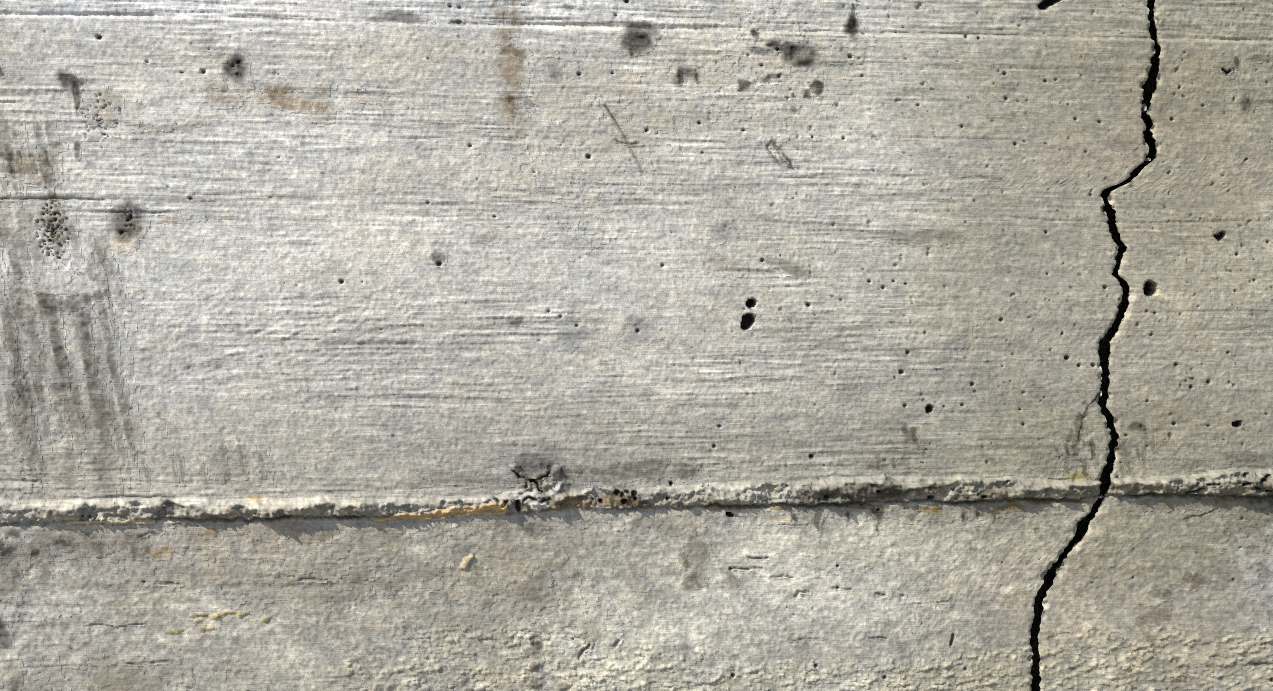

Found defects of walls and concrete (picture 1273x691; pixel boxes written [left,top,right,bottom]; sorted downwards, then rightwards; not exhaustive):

damp [0,108,661,653]
damp [565,410,1099,606]
crack [1030,0,1161,691]